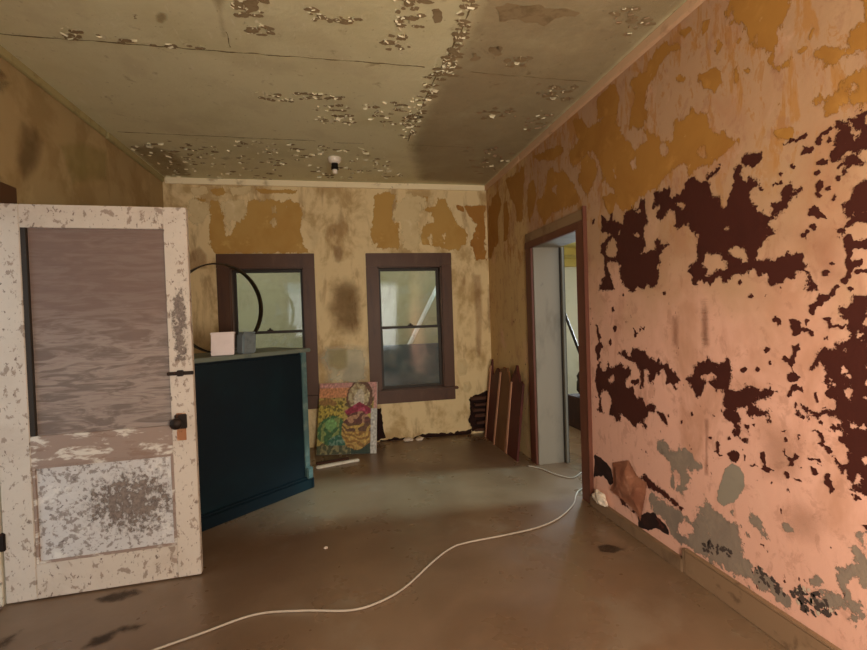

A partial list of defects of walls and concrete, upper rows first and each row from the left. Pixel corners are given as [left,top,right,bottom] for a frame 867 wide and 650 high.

peeling [230,0,275,36]
peeling [304,7,363,25]
peeling [363,0,534,139]
peeling [495,3,580,26]
peeling [724,0,867,72]
peeling [255,91,357,126]
peeling [131,140,403,254]
leakage [333,287,357,327]
peeling [370,19,867,610]
flaking render [809,525,867,628]